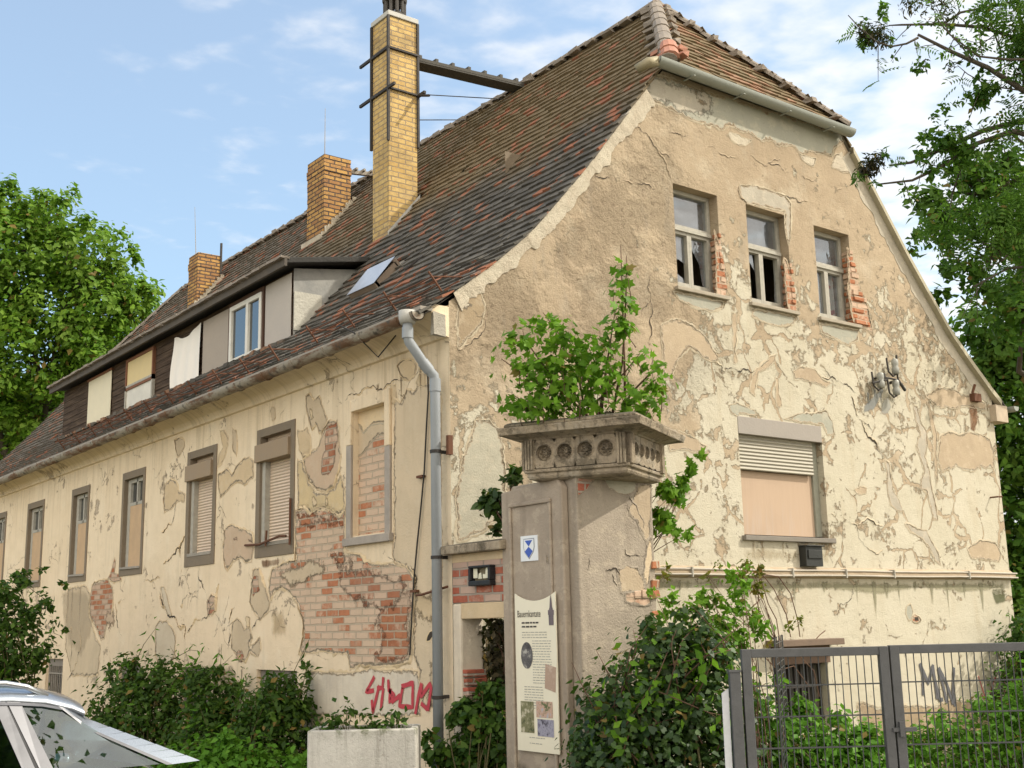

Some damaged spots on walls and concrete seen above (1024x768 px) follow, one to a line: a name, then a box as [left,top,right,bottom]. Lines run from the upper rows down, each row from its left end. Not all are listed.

crack [595,126,685,188]
crack [349,379,402,396]
crack [641,276,659,402]
peeling [668,429,708,454]
peeling [660,318,719,381]
peeling [729,353,835,436]
crack [820,364,883,458]
peeling [884,386,995,565]
flaking render [217,358,507,719]
peeling [967,539,1002,563]
peeling [65,557,122,678]
peeling [155,586,176,666]